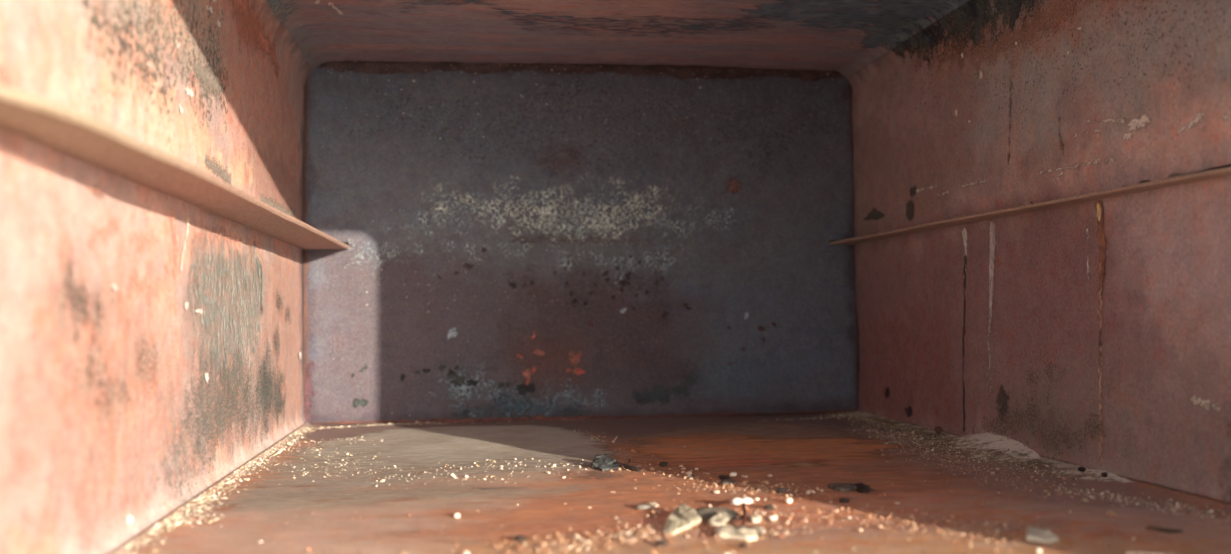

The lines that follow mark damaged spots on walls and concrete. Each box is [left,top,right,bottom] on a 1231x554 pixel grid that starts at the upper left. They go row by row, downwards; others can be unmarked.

damp [401,0,1051,73]
damp [349,172,735,286]
damp [146,292,290,502]
corrosion [407,432,935,536]